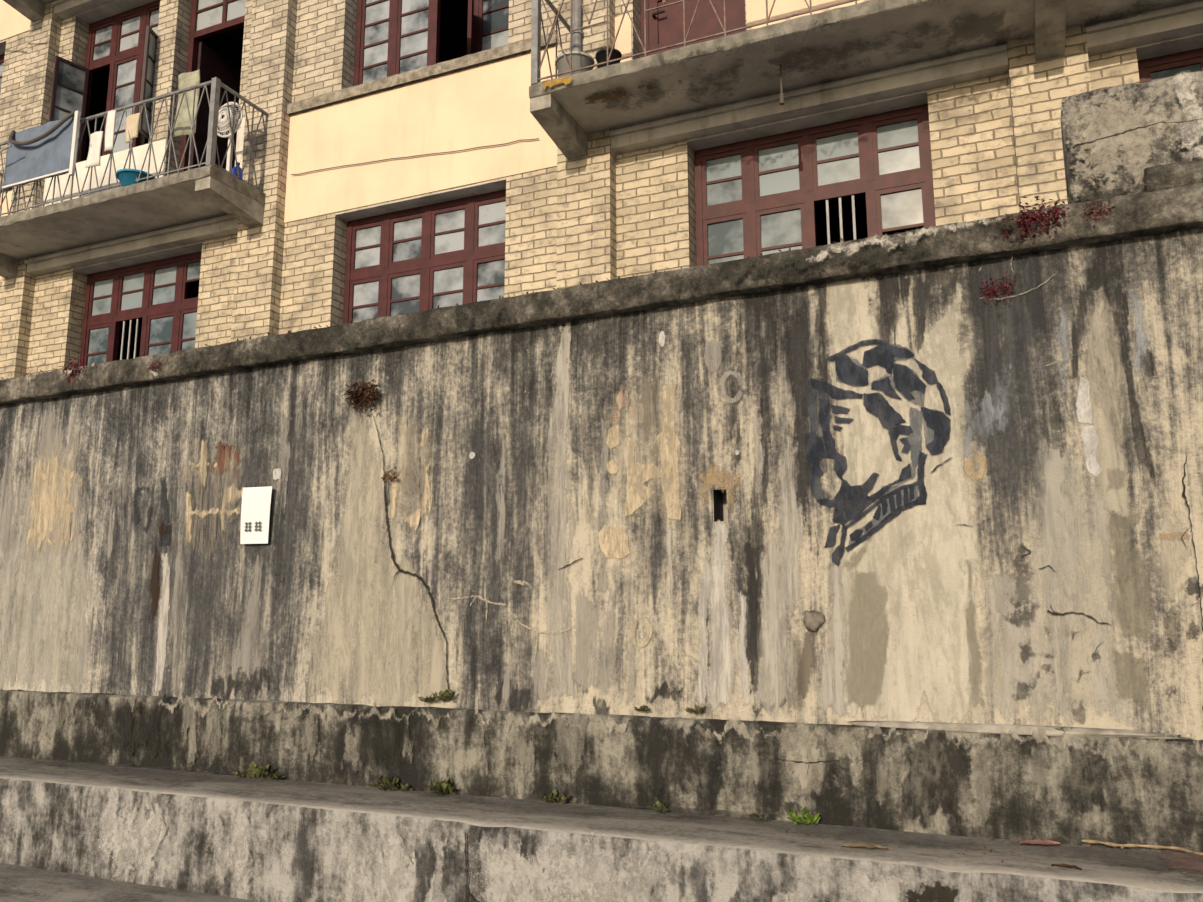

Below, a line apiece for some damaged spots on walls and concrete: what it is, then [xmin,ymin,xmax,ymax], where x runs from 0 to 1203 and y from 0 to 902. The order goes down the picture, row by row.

leakage [16,482,270,780]
peeling [163,696,233,718]
crack [373,415,574,701]
peeling [475,706,628,734]
leakage [495,322,683,774]
peeling [703,715,759,744]
leakage [625,721,990,846]
leakage [698,234,970,716]
peeling [774,276,1159,792]
crack [1047,607,1111,656]
crack [1164,736,1198,744]
crack [1181,456,1203,662]